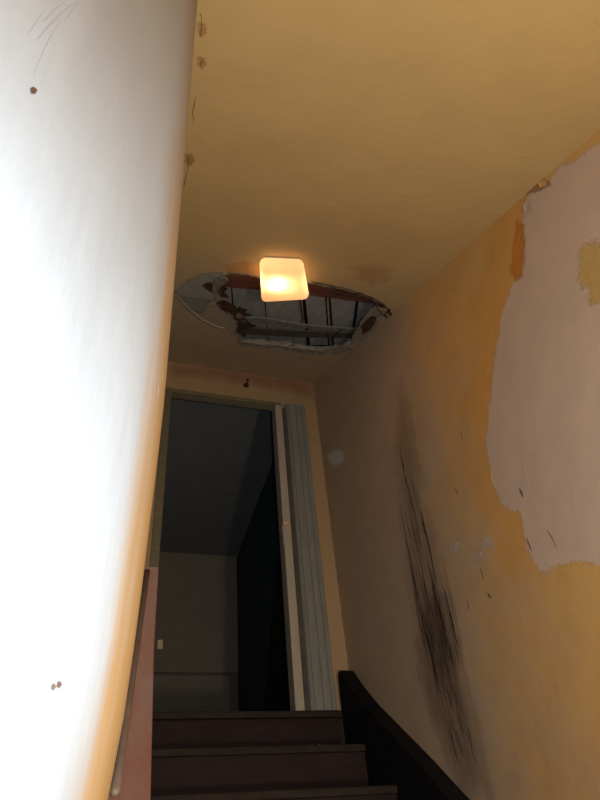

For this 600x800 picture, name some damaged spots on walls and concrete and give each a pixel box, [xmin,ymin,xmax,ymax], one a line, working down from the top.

spalling [175,272,392,355]
peeling [485,142,600,576]
water stain [400,478,475,763]